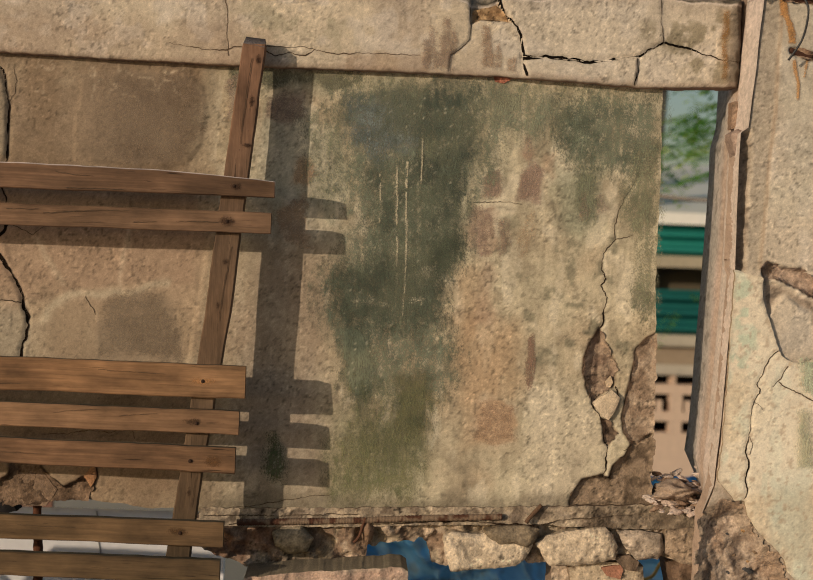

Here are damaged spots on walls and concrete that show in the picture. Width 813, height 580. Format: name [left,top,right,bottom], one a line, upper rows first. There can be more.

crack [498,0,738,86]
rust [779,0,796,44]
crack [0,67,17,162]
crack [0,225,44,356]
water stain [351,162,424,316]
spalling [761,261,813,298]
water stain [525,335,536,388]
spalling [570,330,657,514]
crack [744,351,813,499]
spalling [0,463,97,507]
spalling [237,514,502,544]
spalling [693,499,788,580]